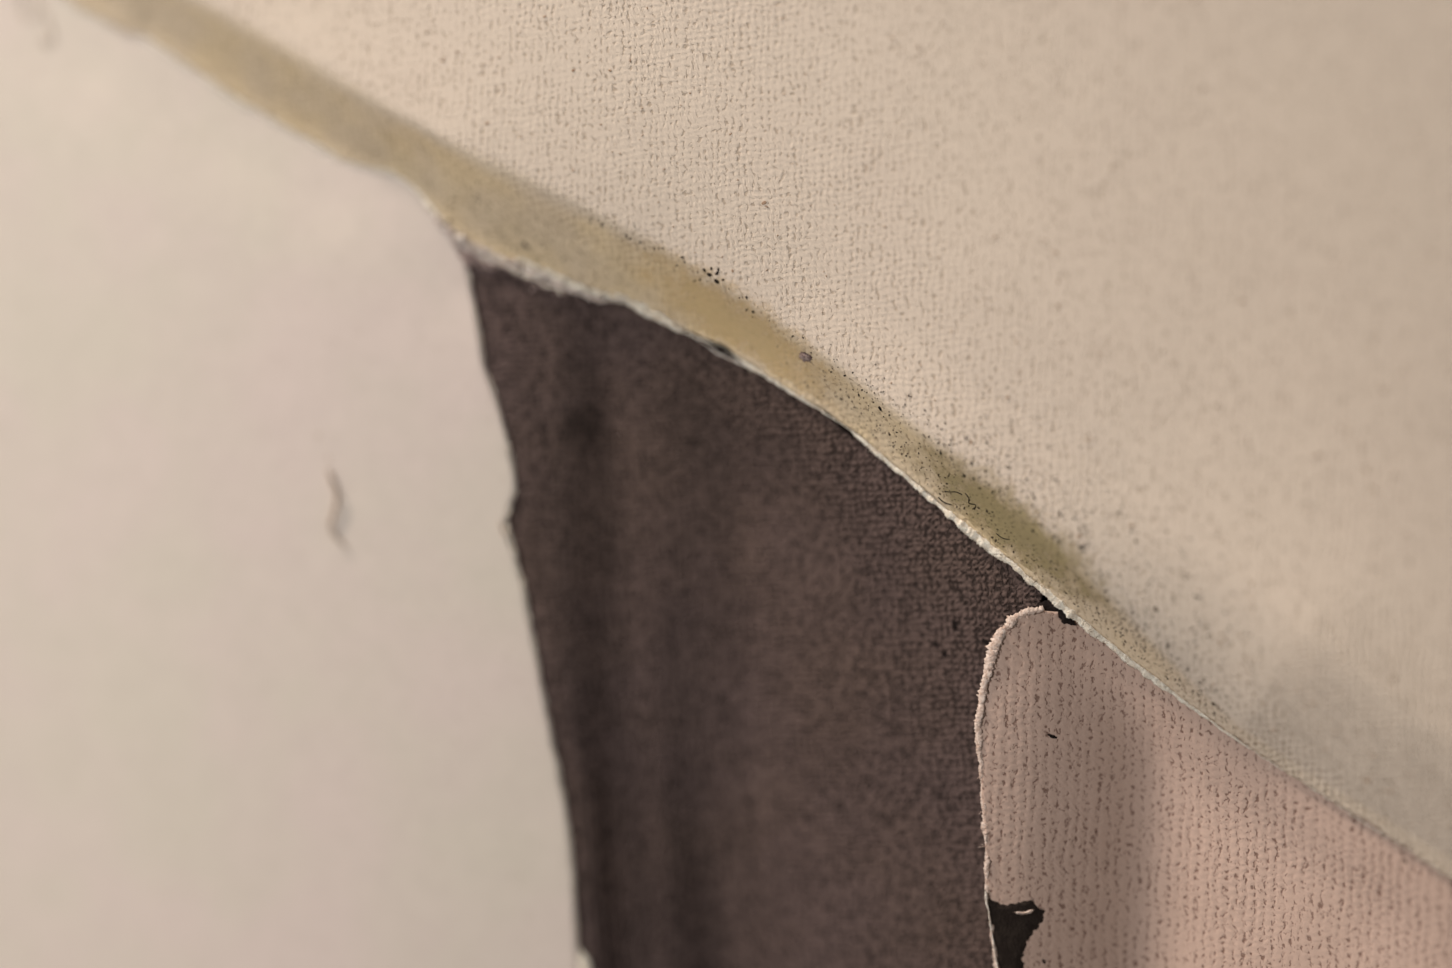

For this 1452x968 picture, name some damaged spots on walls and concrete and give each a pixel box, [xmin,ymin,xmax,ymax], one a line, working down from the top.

spalling [428,209,686,328]
peeling [578,949,591,968]
peeling [984,891,1045,968]